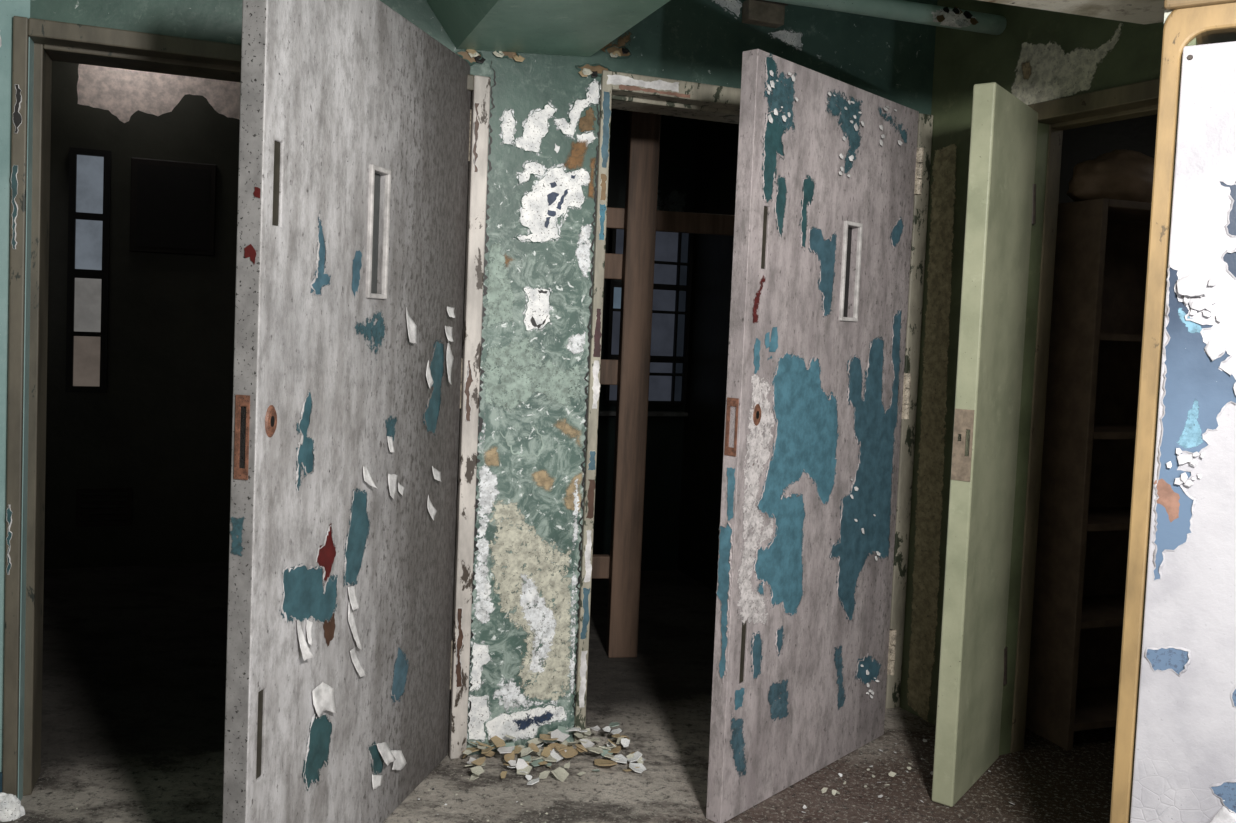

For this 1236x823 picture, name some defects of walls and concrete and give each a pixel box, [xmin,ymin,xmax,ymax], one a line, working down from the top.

peeling [765,29,803,91]
peeling [1011,22,1123,105]
peeling [499,32,679,277]
peeling [762,109,837,317]
peeling [890,217,904,248]
peeling [522,284,552,331]
peeling [566,308,602,409]
peeling [1152,180,1236,581]
peeling [716,309,902,776]
peeling [455,451,596,743]
peeling [1144,646,1191,677]
peeling [1209,779,1236,823]